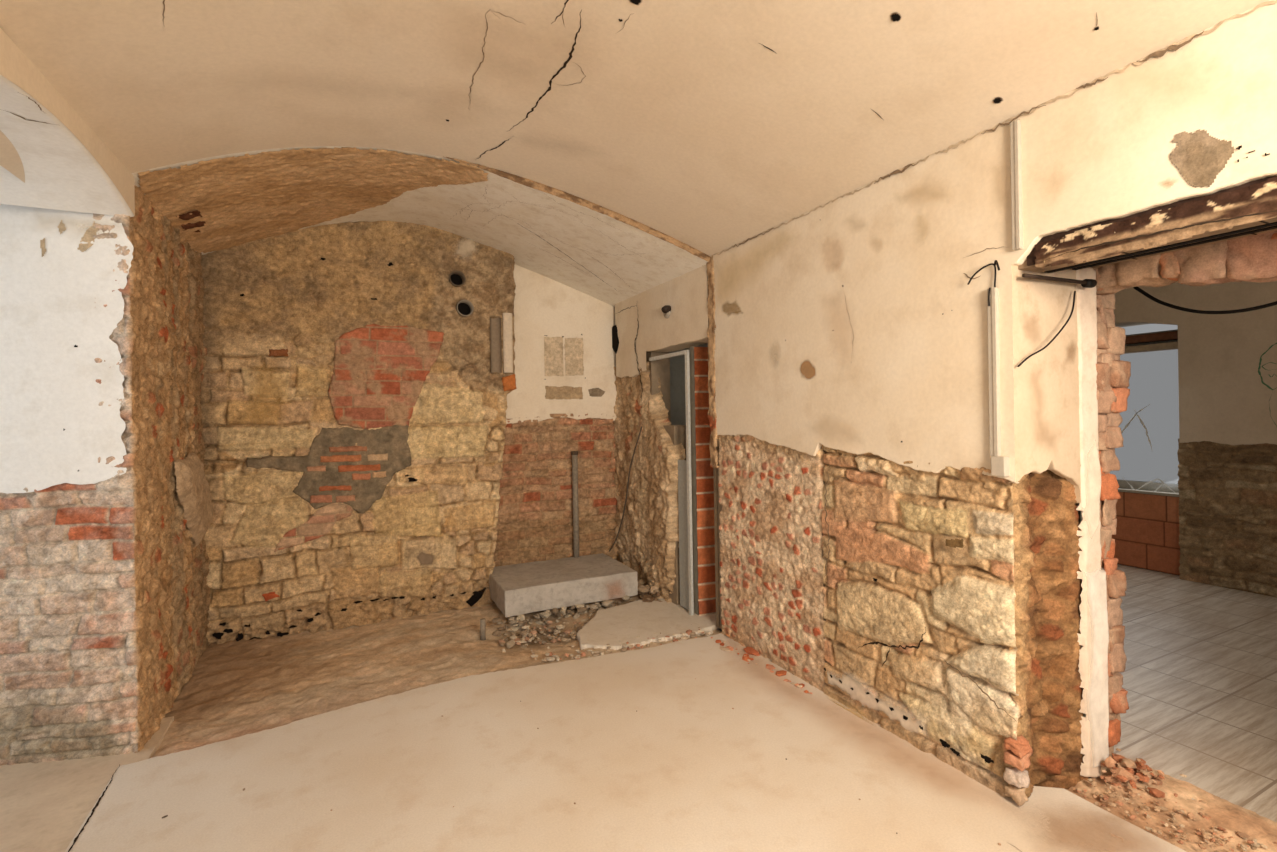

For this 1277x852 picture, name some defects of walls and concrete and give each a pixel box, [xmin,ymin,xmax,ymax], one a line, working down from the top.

crack [468,0,586,159]
crack [448,189,643,413]
spalling [138,147,1088,806]
spalling [1093,230,1277,754]